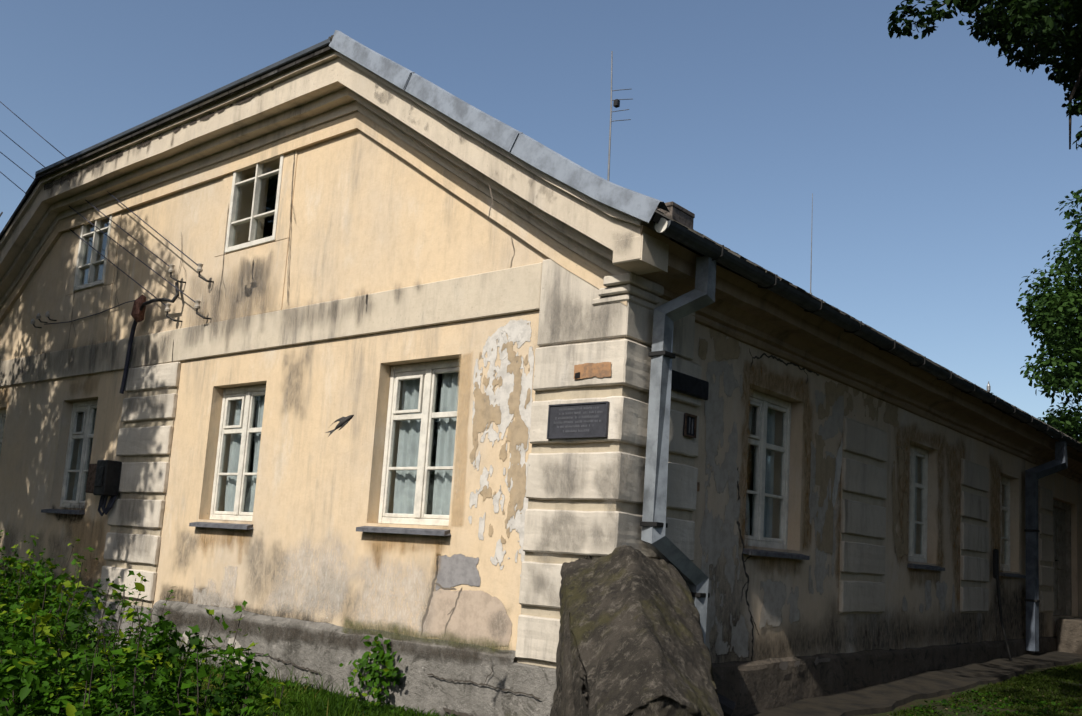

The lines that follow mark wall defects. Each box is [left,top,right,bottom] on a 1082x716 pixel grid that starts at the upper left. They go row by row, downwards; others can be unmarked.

peeling [468,319,534,570]
crack [736,468,759,659]
peeling [697,361,800,658]
leakage [711,583,1026,664]